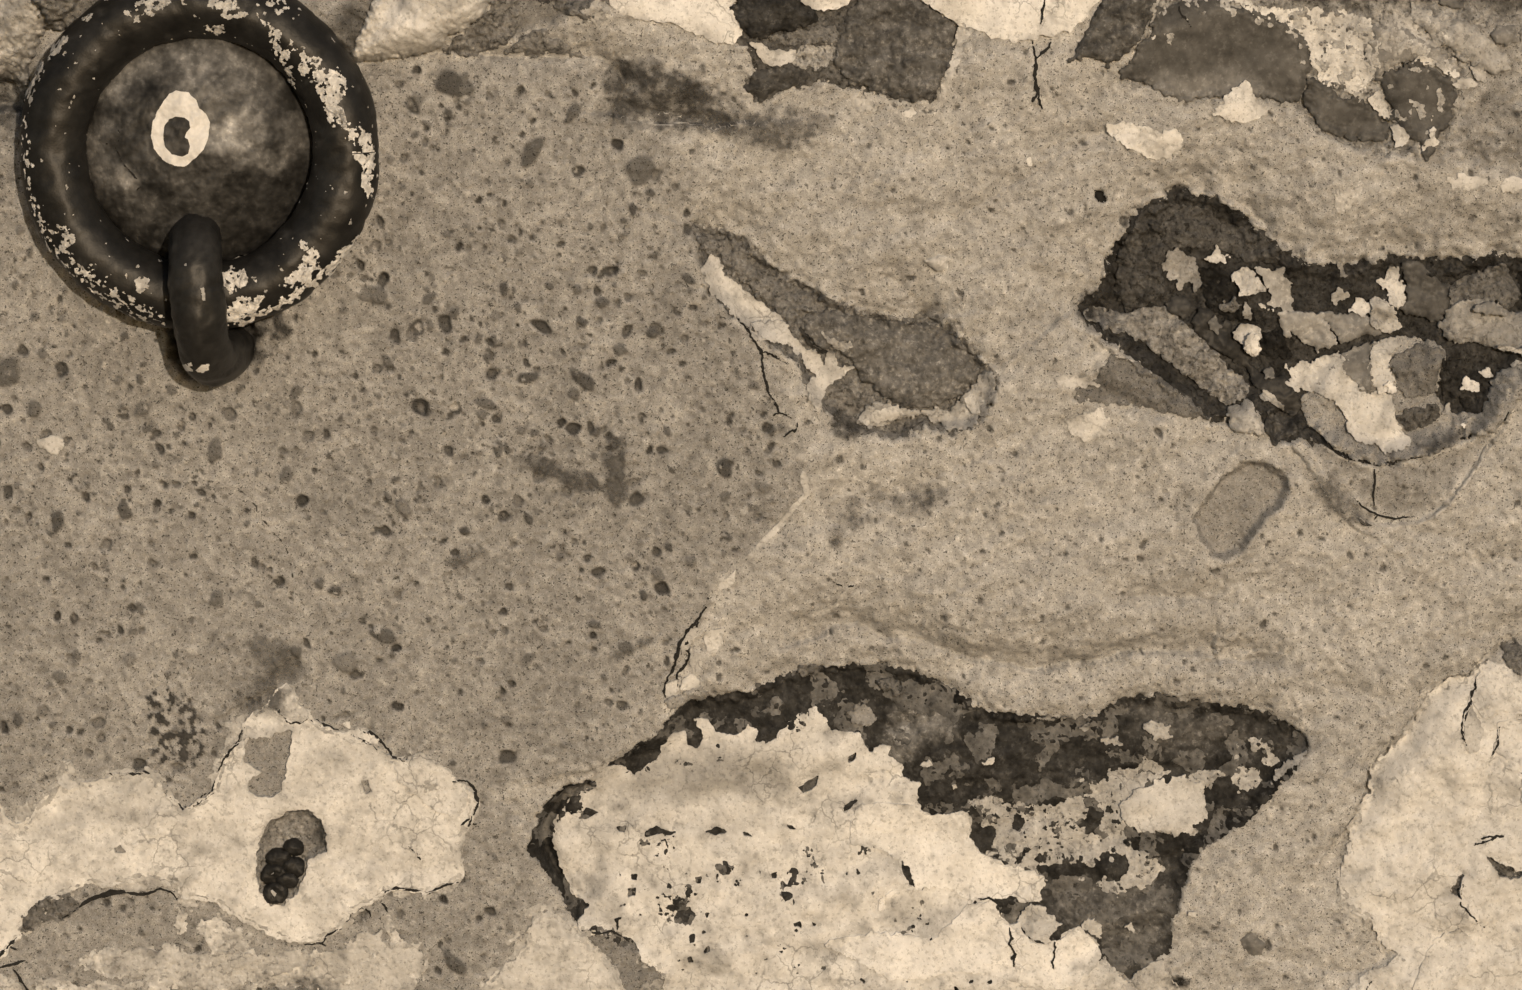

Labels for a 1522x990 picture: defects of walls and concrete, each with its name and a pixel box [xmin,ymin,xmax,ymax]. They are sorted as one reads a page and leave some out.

spalling [442,0,585,59]
spalling [538,0,1522,162]
spalling [692,222,998,440]
spalling [1053,185,1522,525]
crack [662,597,724,698]
peeling [0,678,480,990]
peeling [478,662,1309,990]
peeling [1336,641,1522,990]